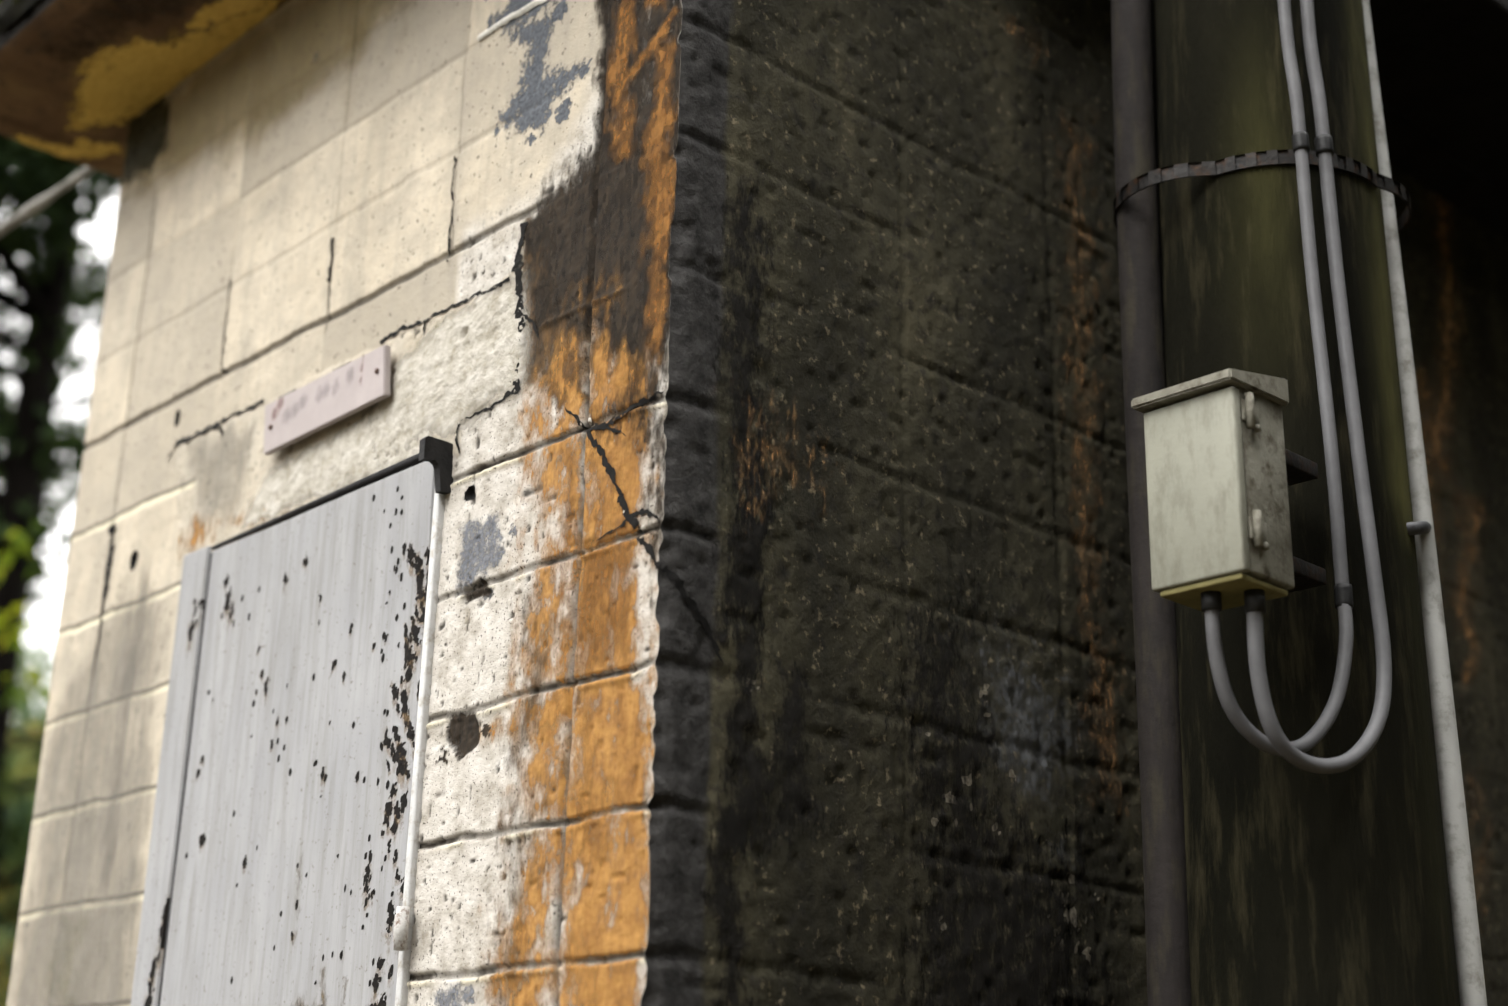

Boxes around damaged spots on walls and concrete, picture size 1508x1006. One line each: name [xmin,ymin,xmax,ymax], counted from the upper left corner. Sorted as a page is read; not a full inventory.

damp [65,0,383,184]
peeling [485,0,593,147]